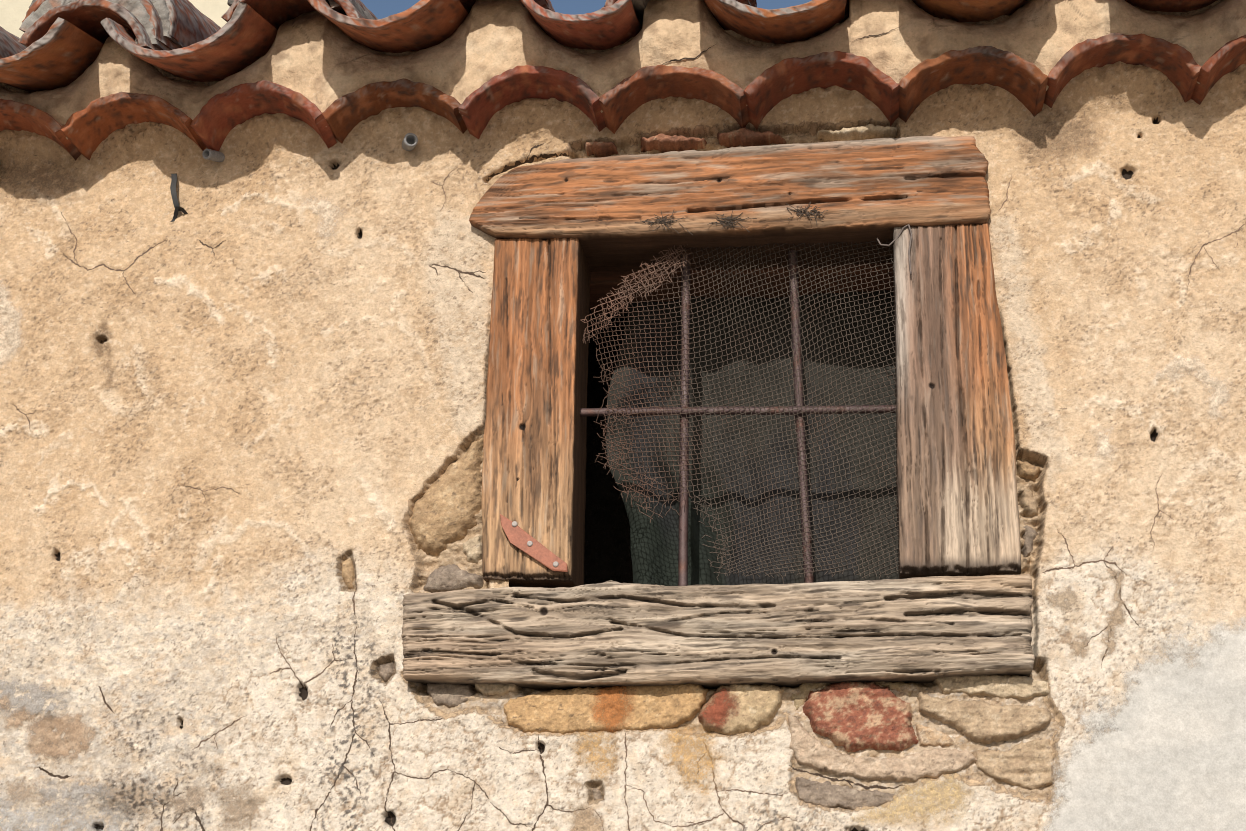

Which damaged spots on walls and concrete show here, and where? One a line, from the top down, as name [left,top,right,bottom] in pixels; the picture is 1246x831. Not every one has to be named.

crack [486,143,569,181]
crack [61,212,167,294]
crack [1187,222,1246,288]
flaking render [336,551,356,592]
flaking render [402,425,490,593]
flaking render [1016,449,1048,576]
crack [1043,532,1141,665]
crack [270,562,901,831]
flaking render [314,621,1115,831]